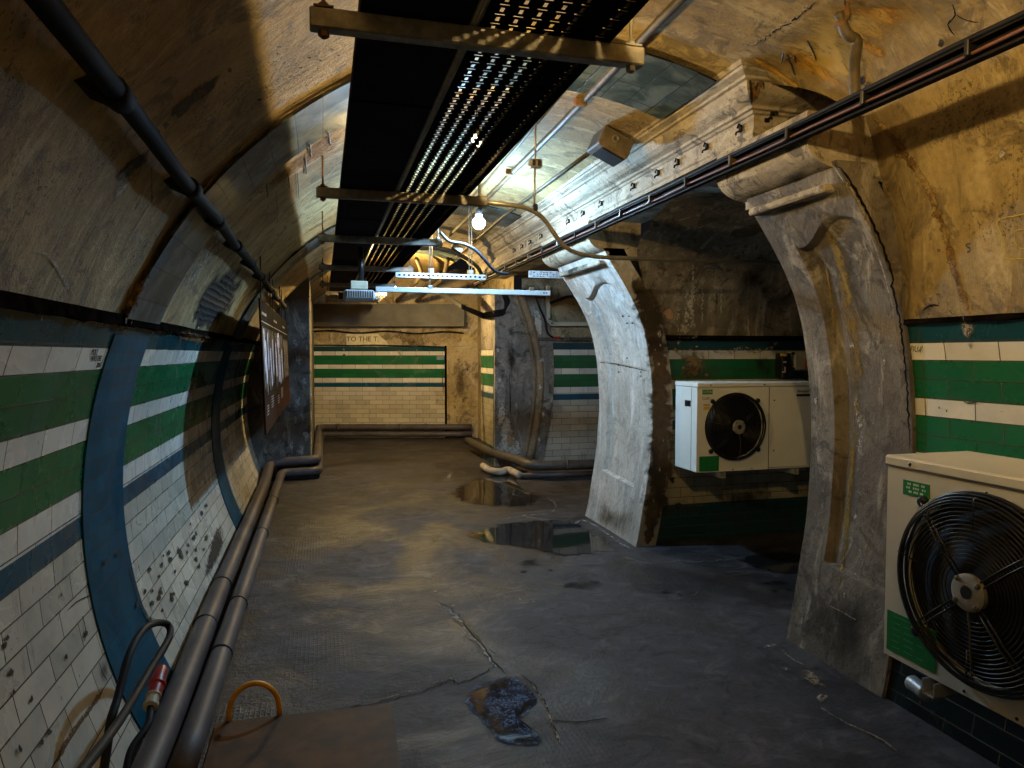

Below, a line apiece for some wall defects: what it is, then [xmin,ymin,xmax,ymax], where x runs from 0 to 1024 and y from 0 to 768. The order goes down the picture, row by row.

crack [742,0,816,53]
corrosion [872,115,969,314]
spalling [131,523,208,621]
crack [335,590,607,745]